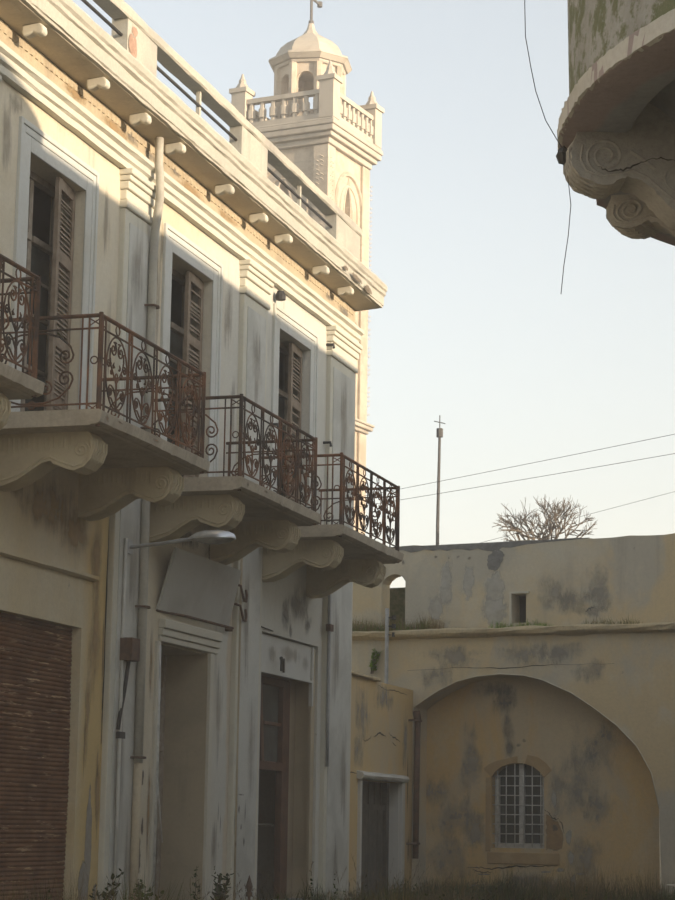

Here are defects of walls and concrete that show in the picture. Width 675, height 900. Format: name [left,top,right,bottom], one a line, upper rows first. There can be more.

crack [598,157,675,172]